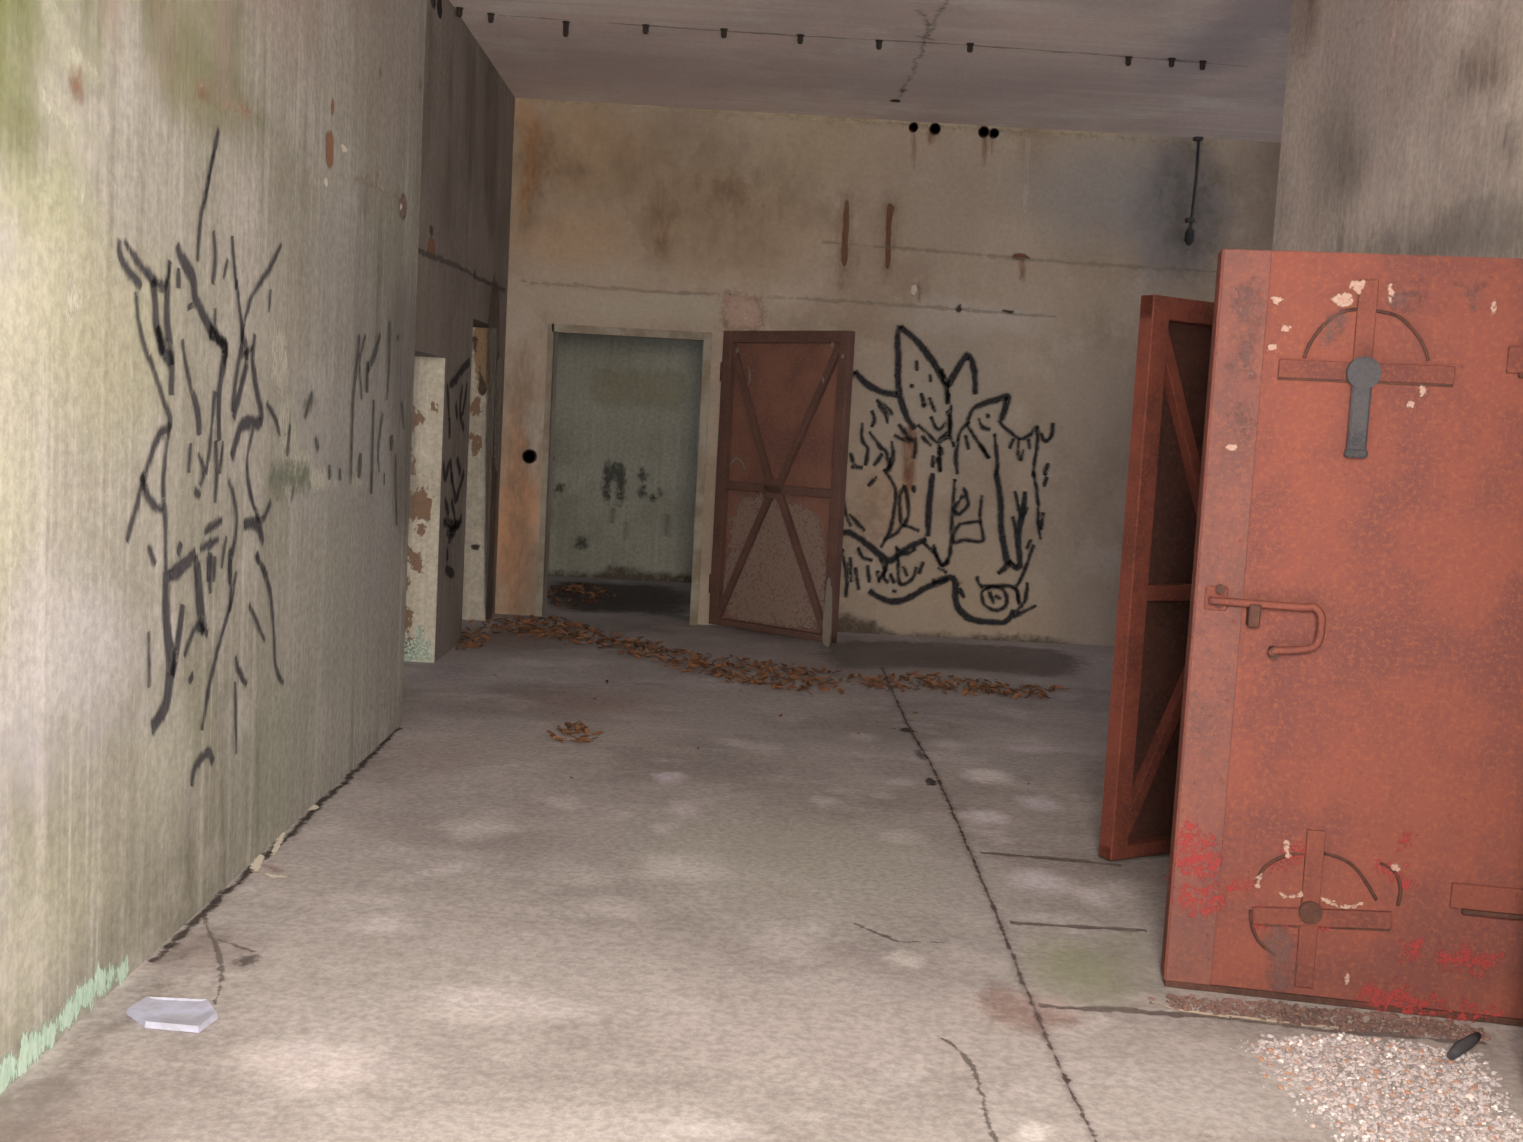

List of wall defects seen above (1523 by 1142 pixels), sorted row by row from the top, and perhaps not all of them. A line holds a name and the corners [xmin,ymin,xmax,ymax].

corrosion [841,201,849,266]
corrosion [885,203,894,269]
peeling [404,399,438,658]
crack [941,1038,998,1142]